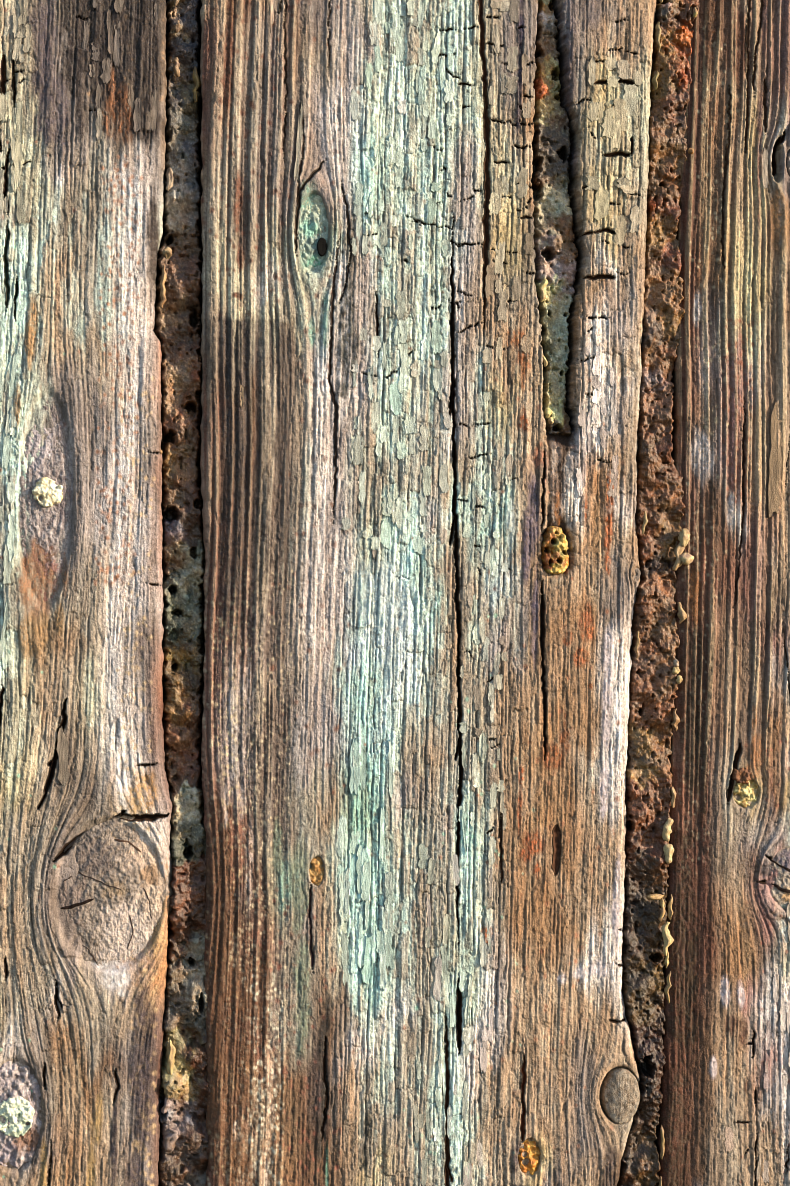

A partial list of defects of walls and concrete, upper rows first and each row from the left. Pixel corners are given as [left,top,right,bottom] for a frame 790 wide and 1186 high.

peeling [0,93,26,224]
peeling [82,0,124,140]
peeling [349,0,454,152]
peeling [488,0,531,119]
peeling [341,290,452,559]
crack [407,0,535,944]
crack [508,451,546,531]
crack [38,699,67,809]
peeling [337,738,395,991]
peeling [418,582,508,1073]
crack [539,581,547,760]
crack [445,978,462,1186]